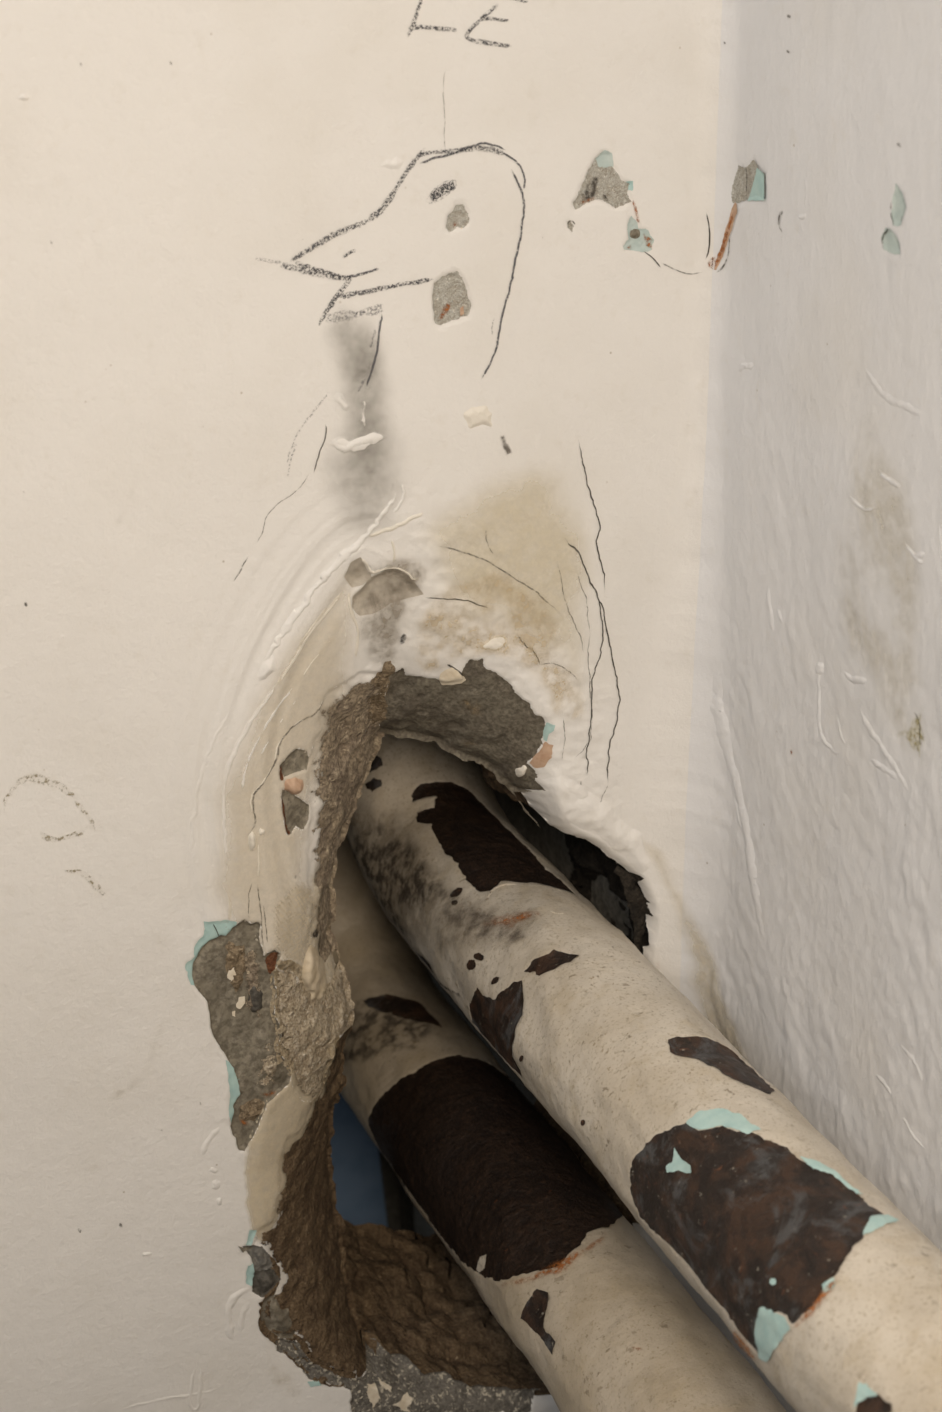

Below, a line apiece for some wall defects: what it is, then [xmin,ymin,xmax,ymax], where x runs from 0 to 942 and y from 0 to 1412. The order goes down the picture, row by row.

peeling [446,204,469,232]
peeling [568,150,654,252]
peeling [708,160,765,270]
peeling [432,271,471,325]
damp [373,563,419,656]
damp [461,492,575,663]
spalling [185,659,653,1412]
peeling [666,1147,691,1173]